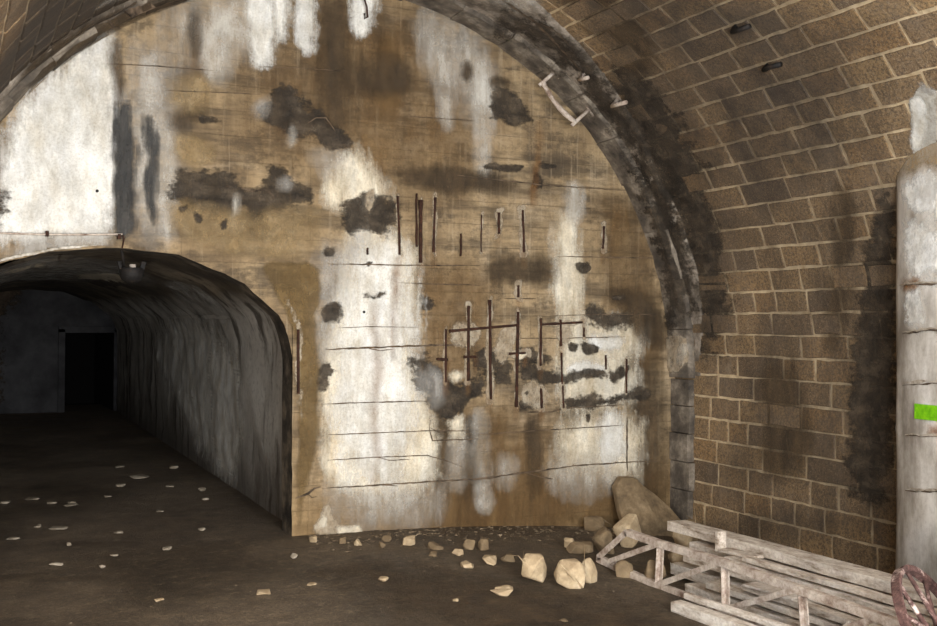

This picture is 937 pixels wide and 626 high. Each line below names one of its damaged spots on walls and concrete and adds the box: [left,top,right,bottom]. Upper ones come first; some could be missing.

water stain [0,35,160,262]
corrosion [415,192,438,263]
corrosion [495,207,504,239]
corrosion [517,205,528,257]
water stain [156,0,663,529]
crack [899,280,937,289]
spalling [452,322,481,347]
spalling [495,322,526,364]
crack [902,326,937,334]
spalling [522,380,550,410]
crack [902,379,937,387]
crack [905,429,937,437]